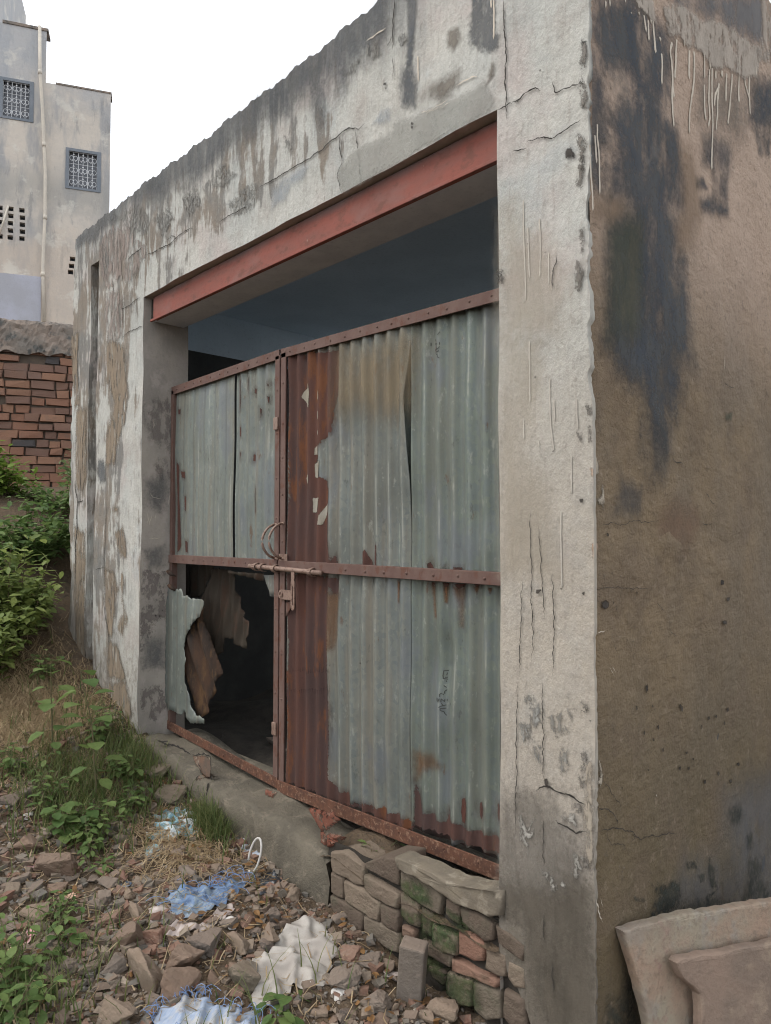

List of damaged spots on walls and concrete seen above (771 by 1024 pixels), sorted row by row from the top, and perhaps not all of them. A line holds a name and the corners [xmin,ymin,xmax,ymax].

water stain [77,212,115,247]
crack [121,228,192,337]
water stain [138,0,388,200]
crack [219,126,362,222]
water stain [402,0,419,106]
crack [514,121,579,151]
water stain [589,0,771,444]
peeling [99,339,129,467]
peeling [115,527,126,558]
peeling [104,568,166,720]
rust [286,350,500,853]
crack [515,515,674,859]